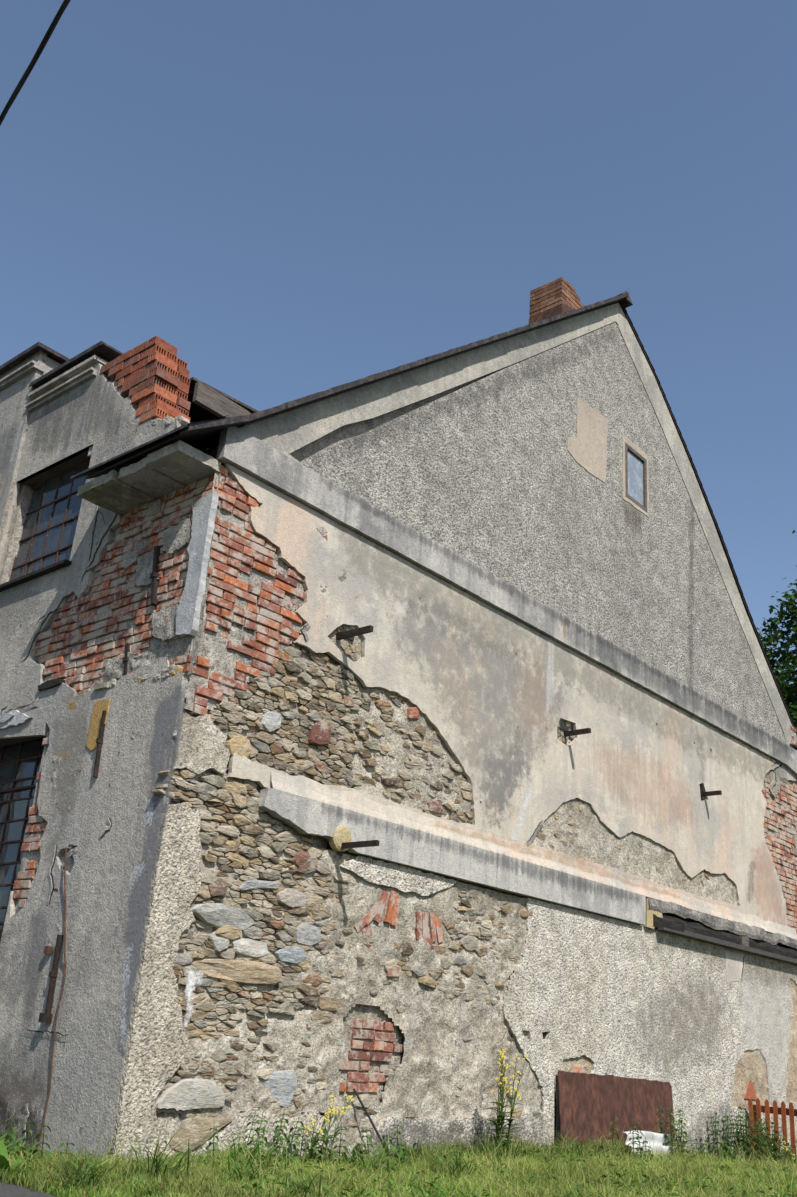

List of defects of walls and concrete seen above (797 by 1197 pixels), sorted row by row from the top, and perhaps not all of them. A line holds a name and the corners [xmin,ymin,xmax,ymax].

flaking render [0,710,32,730]
spalling [557,719,575,746]
spalling [13,734,85,914]
spalling [34,465,541,1159]
spalling [529,798,737,904]
spalling [761,756,797,933]
spalling [542,1032,612,1076]
peeling [731,1049,768,1111]
peeling [786,979,797,1104]